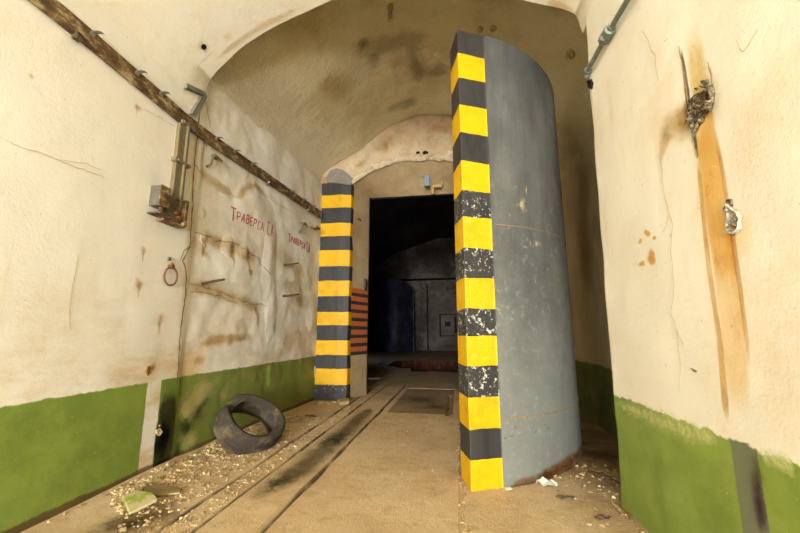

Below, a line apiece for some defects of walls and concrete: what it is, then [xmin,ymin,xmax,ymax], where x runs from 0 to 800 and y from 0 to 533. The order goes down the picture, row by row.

rust [681,55,690,112]
spalling [678,46,715,157]
crack [0,137,110,180]
spalling [722,199,743,235]
damp [189,282,263,325]
damp [195,232,272,275]
crack [172,100,302,451]
crack [659,132,697,390]